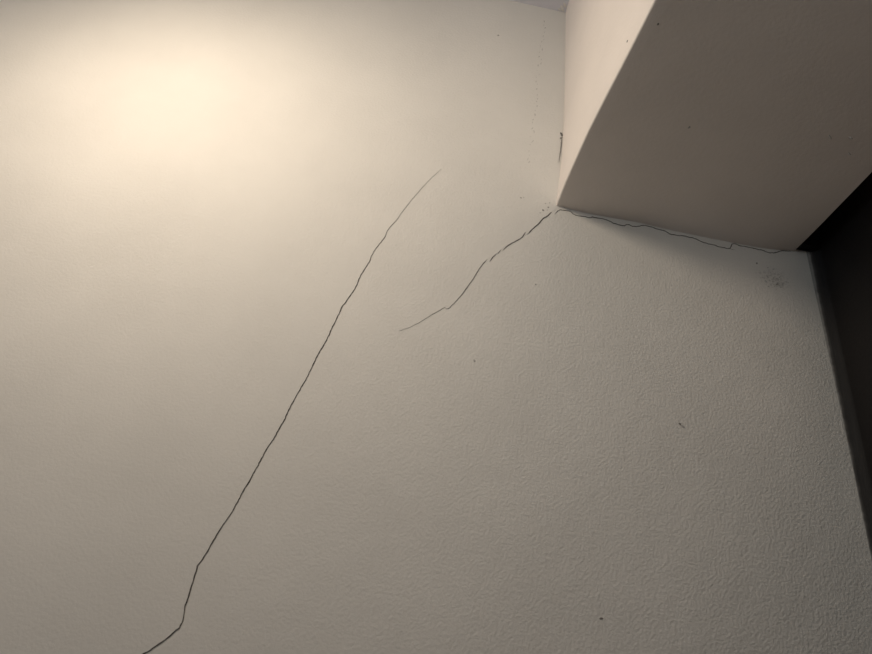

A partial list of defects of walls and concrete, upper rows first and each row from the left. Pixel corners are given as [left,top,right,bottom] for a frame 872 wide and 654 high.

crack [143,170,440,654]
crack [406,209,784,329]